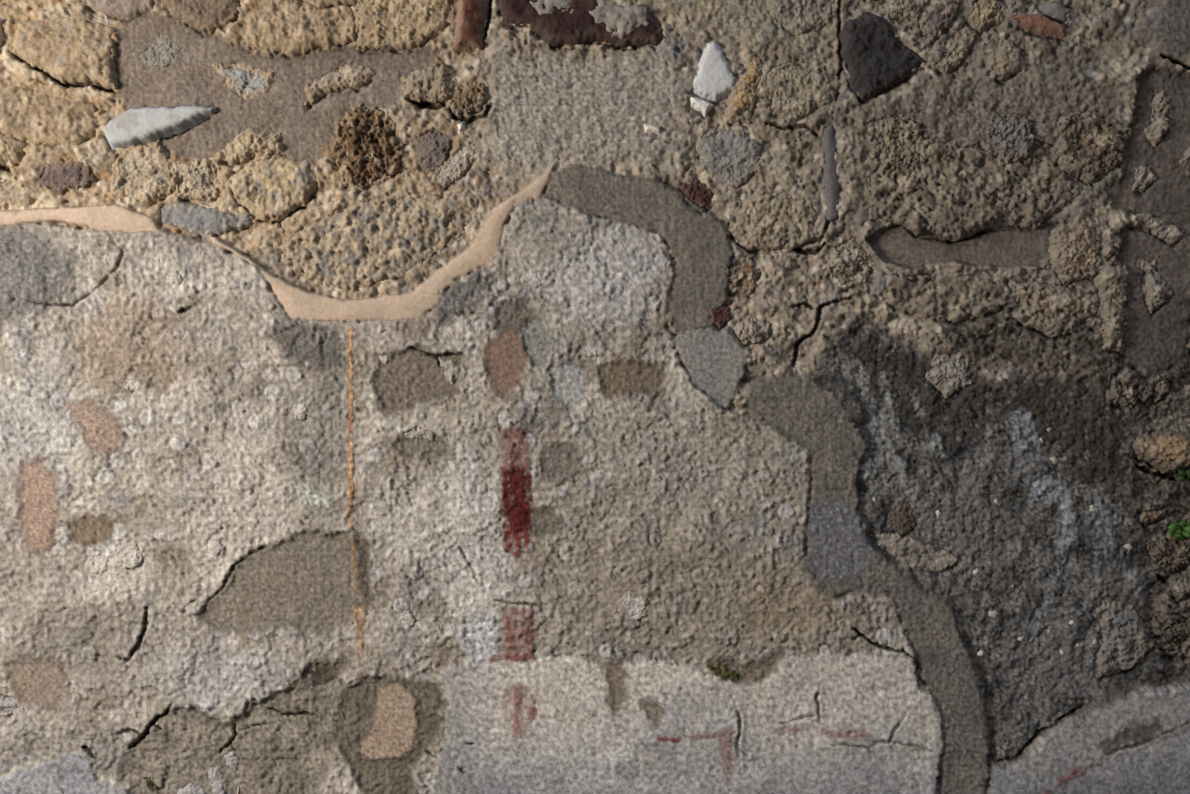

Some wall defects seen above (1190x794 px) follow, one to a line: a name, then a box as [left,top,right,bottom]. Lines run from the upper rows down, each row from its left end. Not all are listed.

crack [765,0,861,137]
crack [31,250,124,306]
crack [792,297,851,367]
crack [182,546,266,613]
flaking render [185,530,372,635]
crack [117,606,149,661]
flaking render [119,658,445,794]
crack [782,692,820,724]
crack [834,717,914,753]